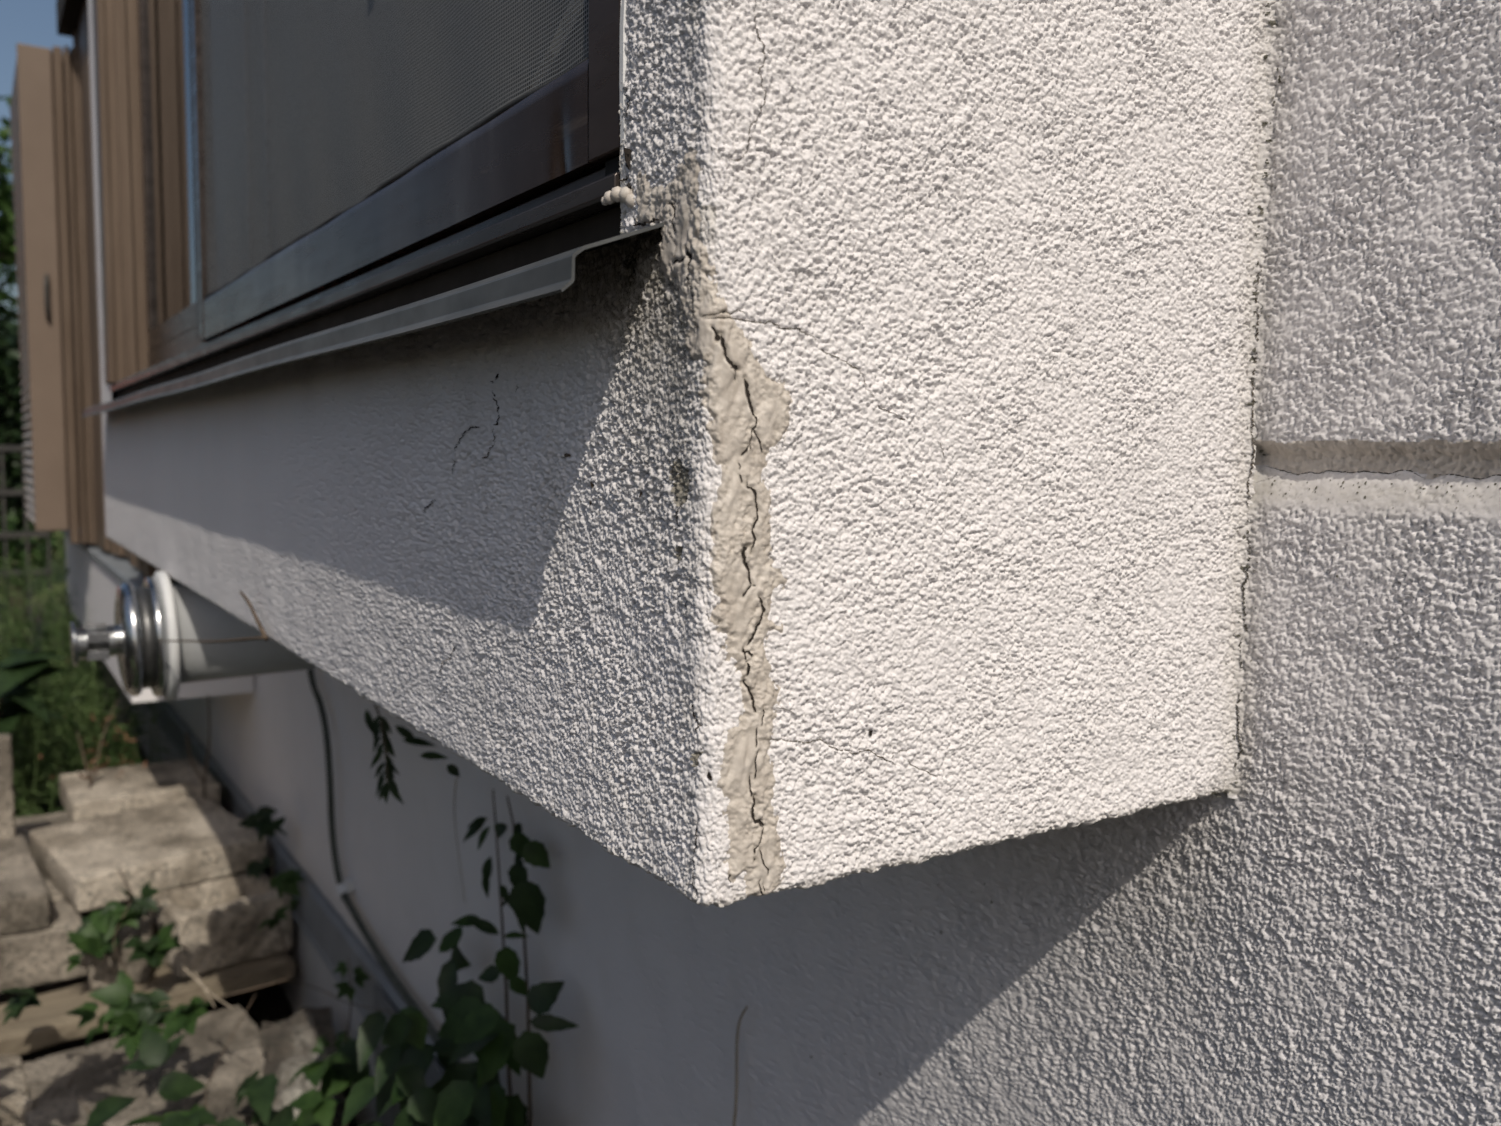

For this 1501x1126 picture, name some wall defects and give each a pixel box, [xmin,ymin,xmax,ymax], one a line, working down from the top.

crack [666,202,936,897]
crack [1211,3,1501,800]